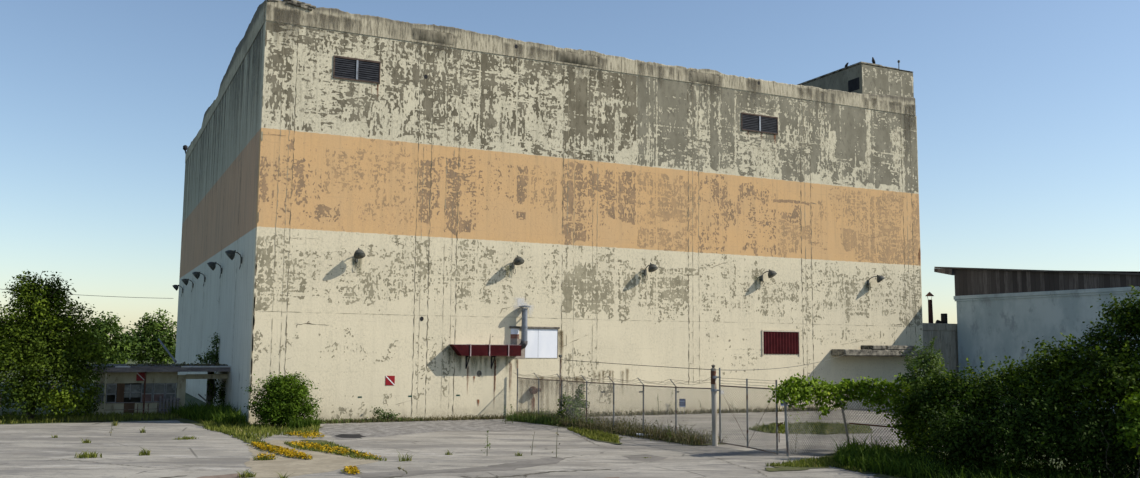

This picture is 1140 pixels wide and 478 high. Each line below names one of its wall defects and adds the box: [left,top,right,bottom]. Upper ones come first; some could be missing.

peeling [250,22,922,400]